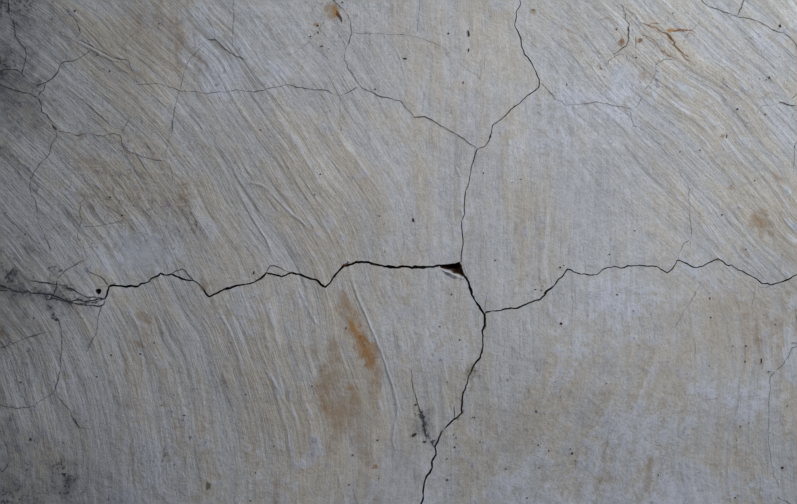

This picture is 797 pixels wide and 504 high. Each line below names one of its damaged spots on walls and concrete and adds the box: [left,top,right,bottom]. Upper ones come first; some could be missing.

crack [702,0,797,47]
crack [0,0,673,261]
crack [0,206,439,328]
crack [2,320,84,429]
crack [411,221,797,504]